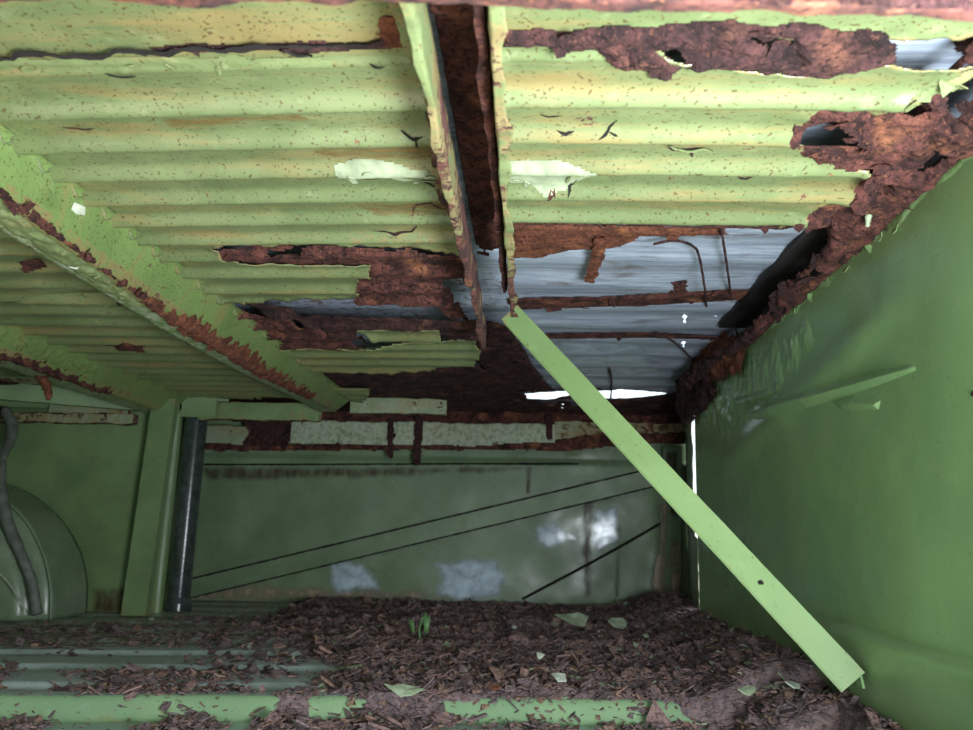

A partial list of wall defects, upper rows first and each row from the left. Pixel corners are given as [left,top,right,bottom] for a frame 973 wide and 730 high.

rust [806,0,973,11]
rust [149,43,245,57]
rust [259,16,403,54]
rust [502,19,898,81]
rust [949,37,973,69]
rust [320,147,432,158]
rust [0,187,317,400]
rust [507,99,973,471]
rust [205,245,616,466]
peeling [608,618,627,628]
peeling [552,673,567,682]
peeling [738,685,756,696]